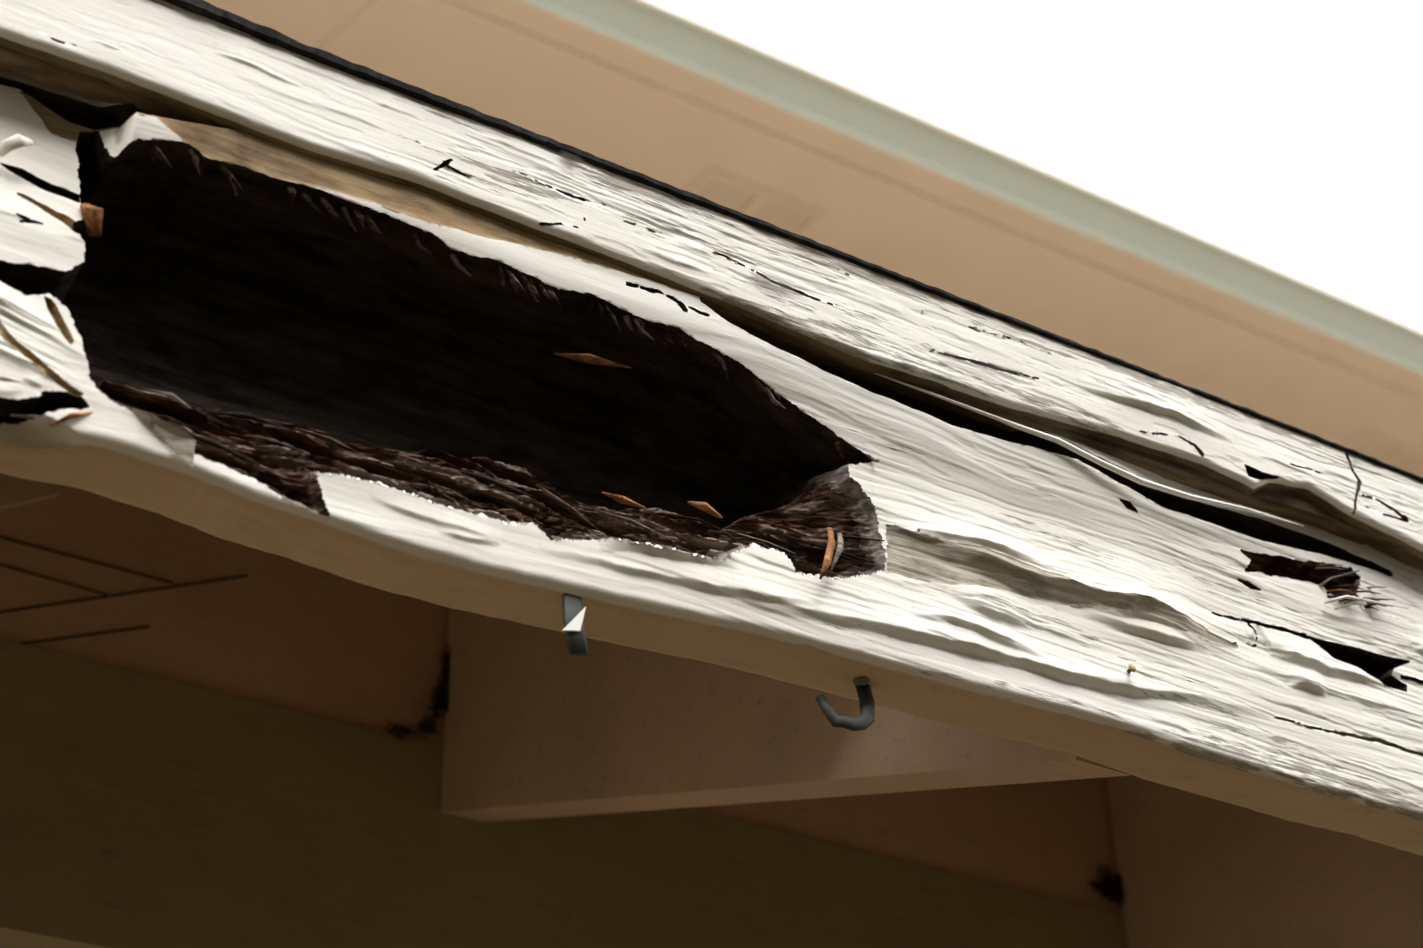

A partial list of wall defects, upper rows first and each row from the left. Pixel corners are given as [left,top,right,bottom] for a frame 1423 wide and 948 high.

spalling [0,90,873,531]
crack [1139,431,1204,457]
crack [1290,453,1409,522]
crack [1211,611,1423,692]
crack [1275,716,1423,756]